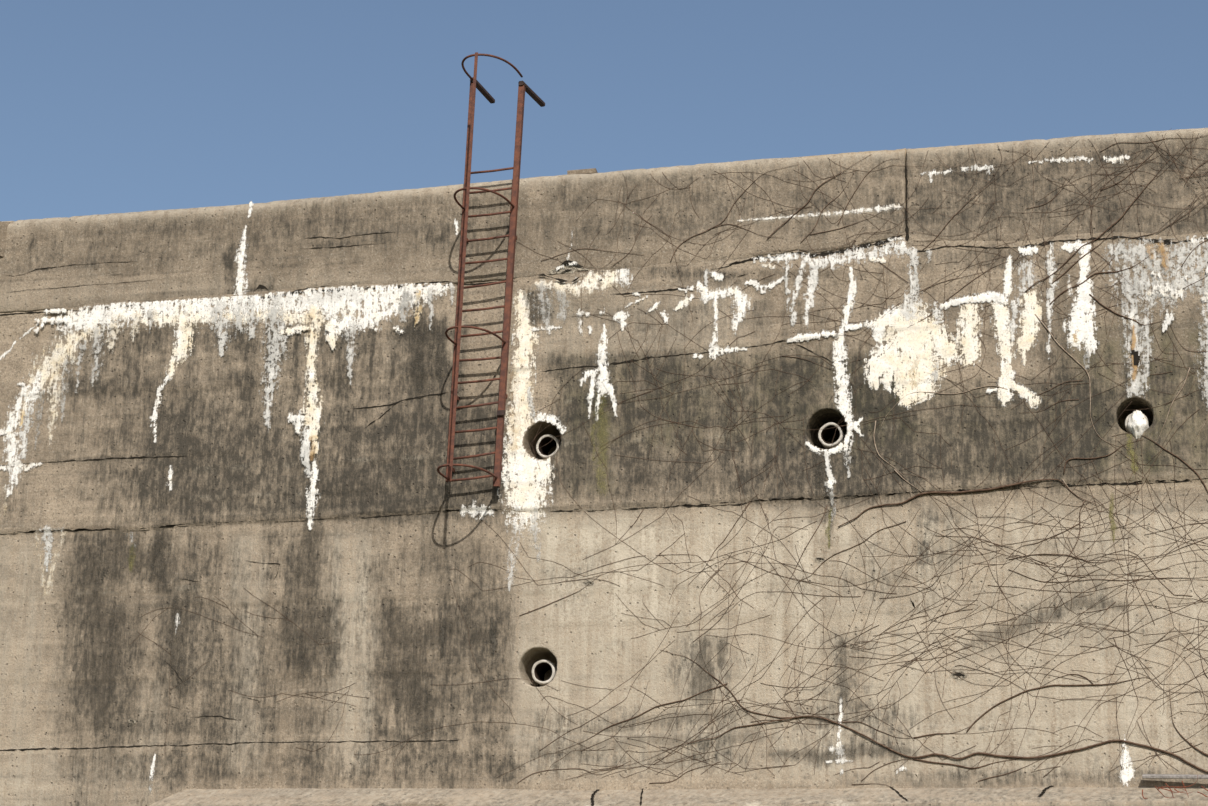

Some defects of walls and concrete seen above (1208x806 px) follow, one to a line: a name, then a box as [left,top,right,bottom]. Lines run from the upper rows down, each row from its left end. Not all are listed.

water stain [921,164,994,183]
water stain [1029,155,1130,164]
water stain [739,204,901,222]
water stain [0,201,455,530]
water stain [460,235,1208,591]
water stain [35,526,64,594]